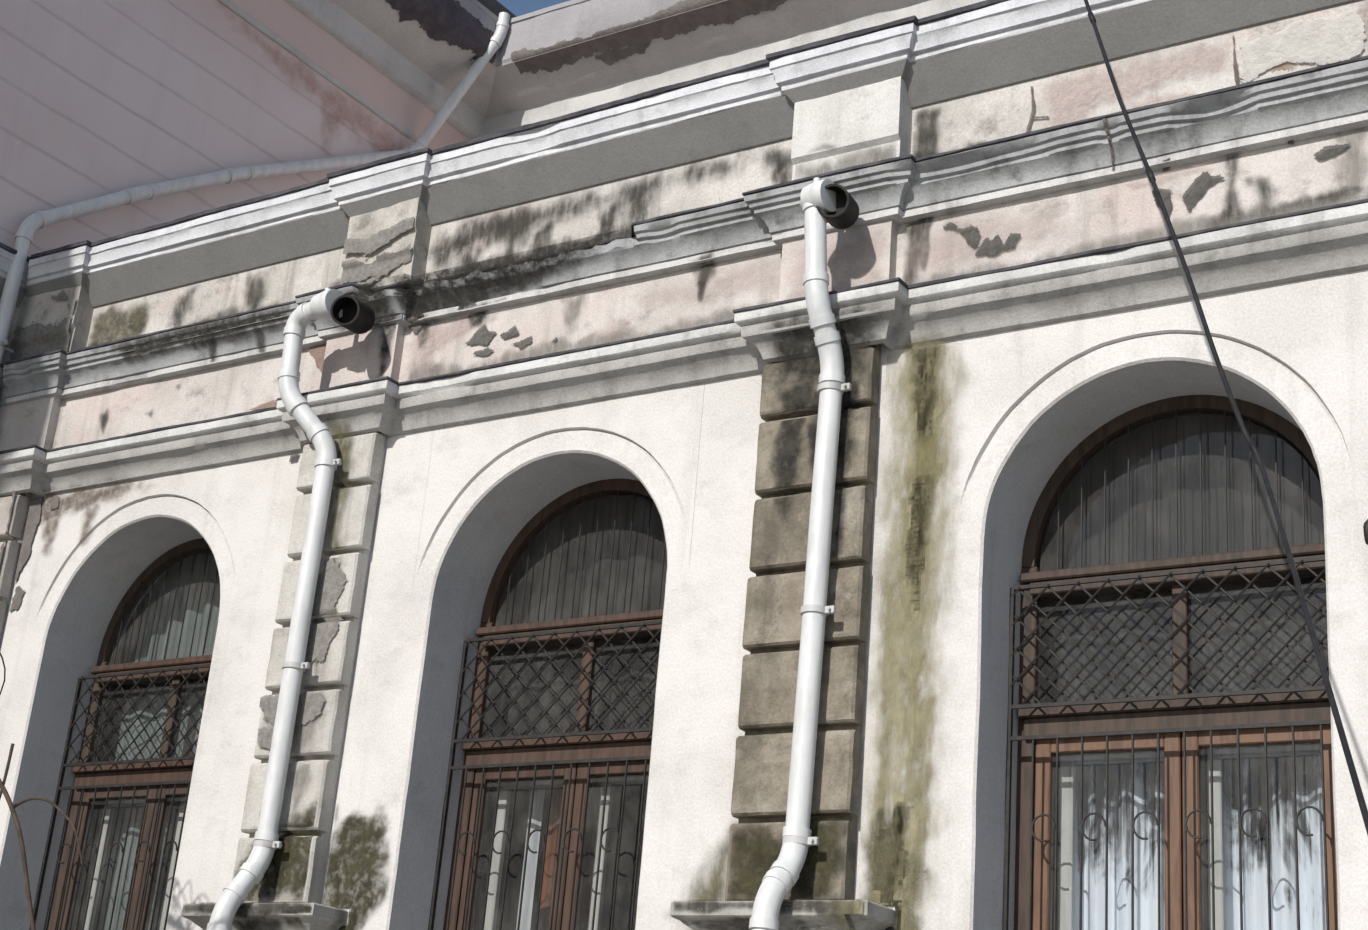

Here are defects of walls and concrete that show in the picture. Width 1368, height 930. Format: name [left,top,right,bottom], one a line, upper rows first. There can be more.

peeling [385,0,787,74]
leakage [687,163,730,179]
leakage [768,153,791,184]
flaking render [1151,172,1225,219]
flaking render [1314,143,1351,160]
flaking render [943,222,1021,257]
leakage [335,178,657,381]
leakage [698,254,714,298]
leakage [90,279,284,361]
flaking render [405,316,532,379]
leakage [773,307,944,930]
leakage [675,828,782,930]